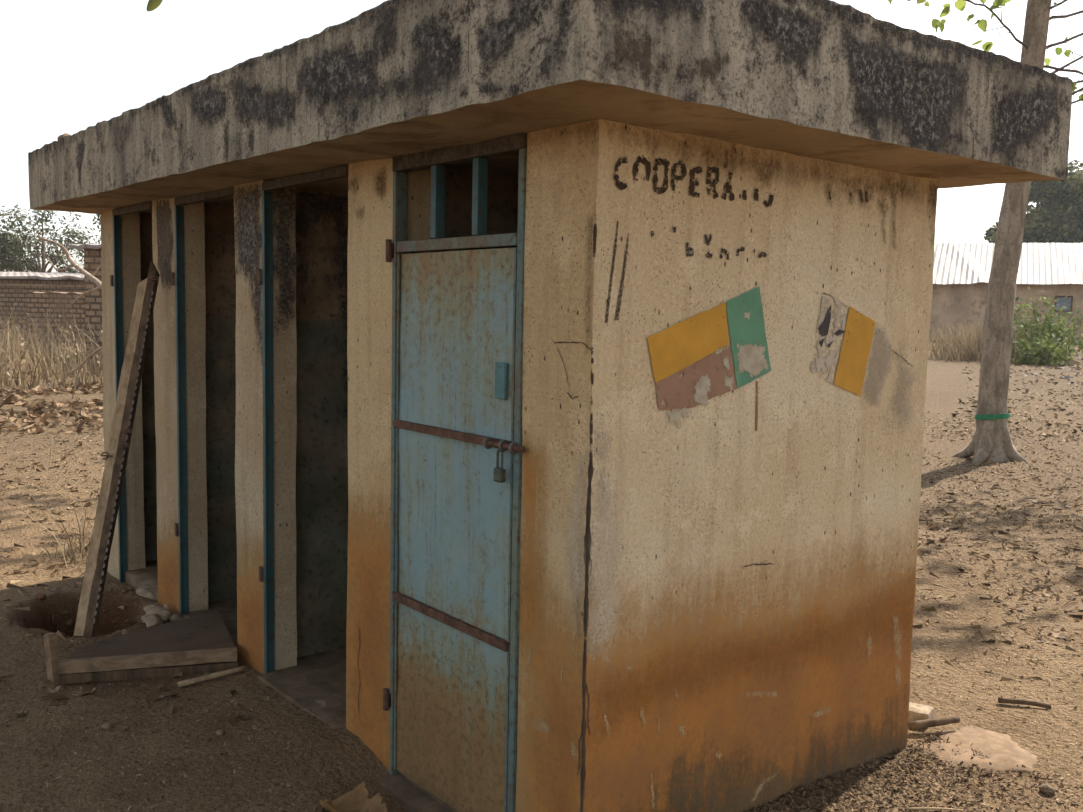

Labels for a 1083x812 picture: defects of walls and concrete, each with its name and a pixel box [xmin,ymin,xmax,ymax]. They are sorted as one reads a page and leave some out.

leakage [29,136,84,184]
leakage [138,96,182,153]
leakage [182,0,462,161]
leakage [460,0,536,96]
leakage [537,0,576,77]
leakage [594,0,705,90]
leakage [740,0,1073,155]
leakage [234,184,348,365]
crack [591,218,599,257]
peeling [665,374,711,429]
peeling [715,343,769,391]
crack [552,334,594,812]